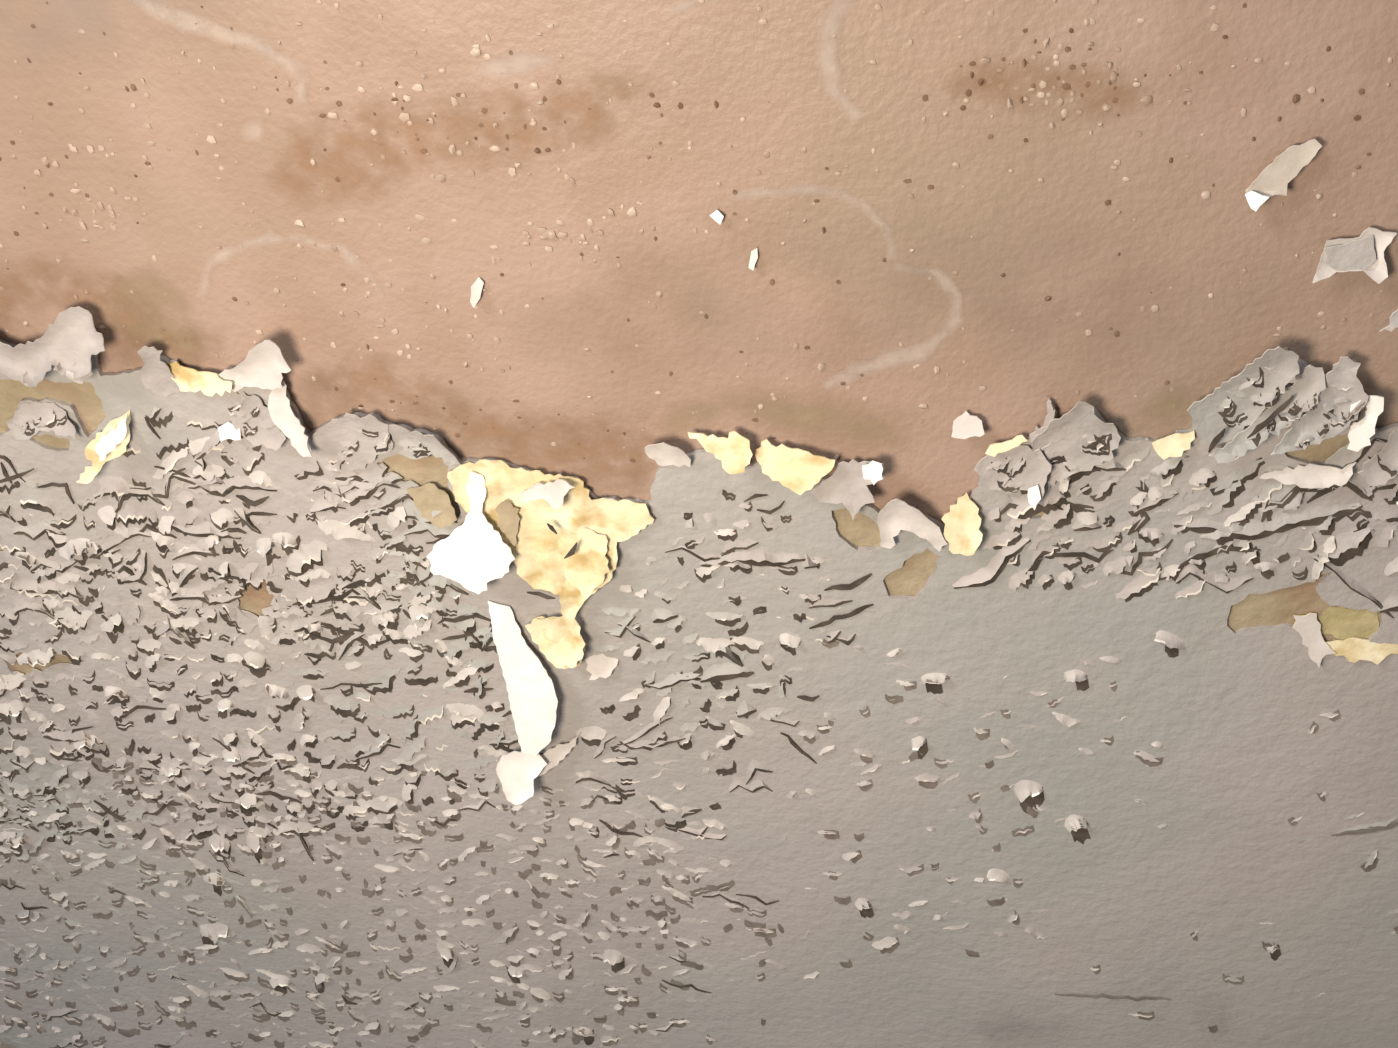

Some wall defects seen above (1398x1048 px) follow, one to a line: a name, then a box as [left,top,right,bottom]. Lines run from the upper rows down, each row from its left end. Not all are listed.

flaking render [960,57,1005,111]
flaking render [1056,28,1092,97]
peeling [748,248,758,270]
peeling [1312,227,1397,284]
peeling [470,276,484,308]